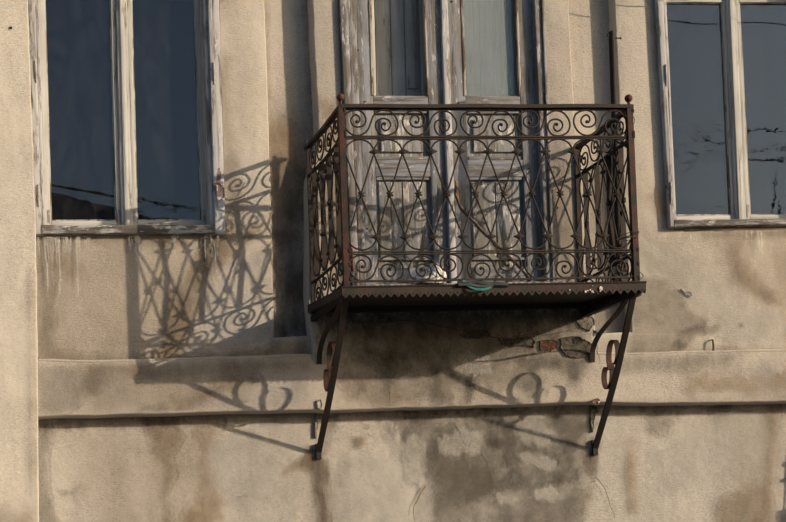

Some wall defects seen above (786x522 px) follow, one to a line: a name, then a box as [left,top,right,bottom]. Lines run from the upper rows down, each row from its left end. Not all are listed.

spalling [460,316,595,359]